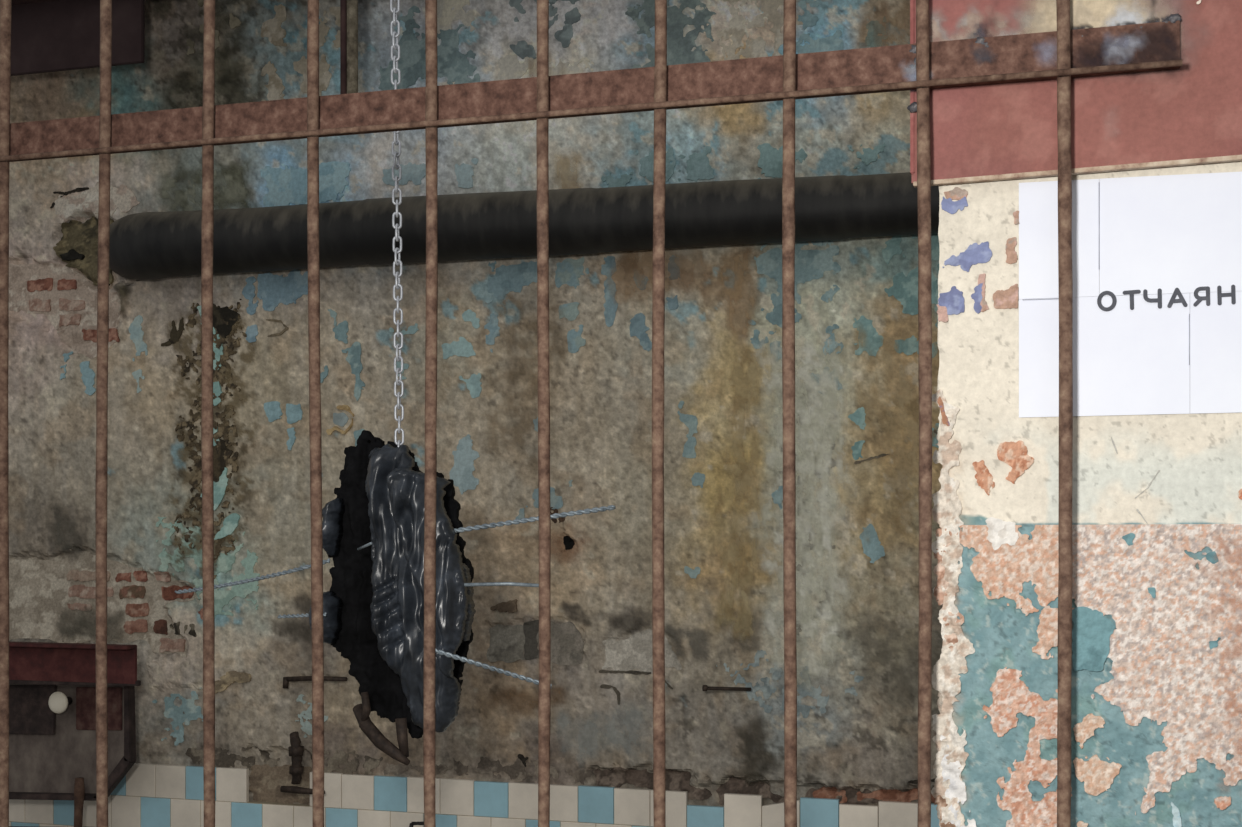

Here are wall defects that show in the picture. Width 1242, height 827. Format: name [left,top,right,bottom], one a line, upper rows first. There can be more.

peeling [379,0,480,91]
peeling [625,0,844,69]
flaking render [9,182,148,395]
peeling [801,211,1019,399]
flaking render [9,270,308,657]
damp [721,328,940,700]
damp [563,603,588,623]
damp [609,608,651,634]
damp [665,626,707,656]
flaking render [805,389,1242,827]
flaking render [152,671,784,805]
damp [738,721,775,783]